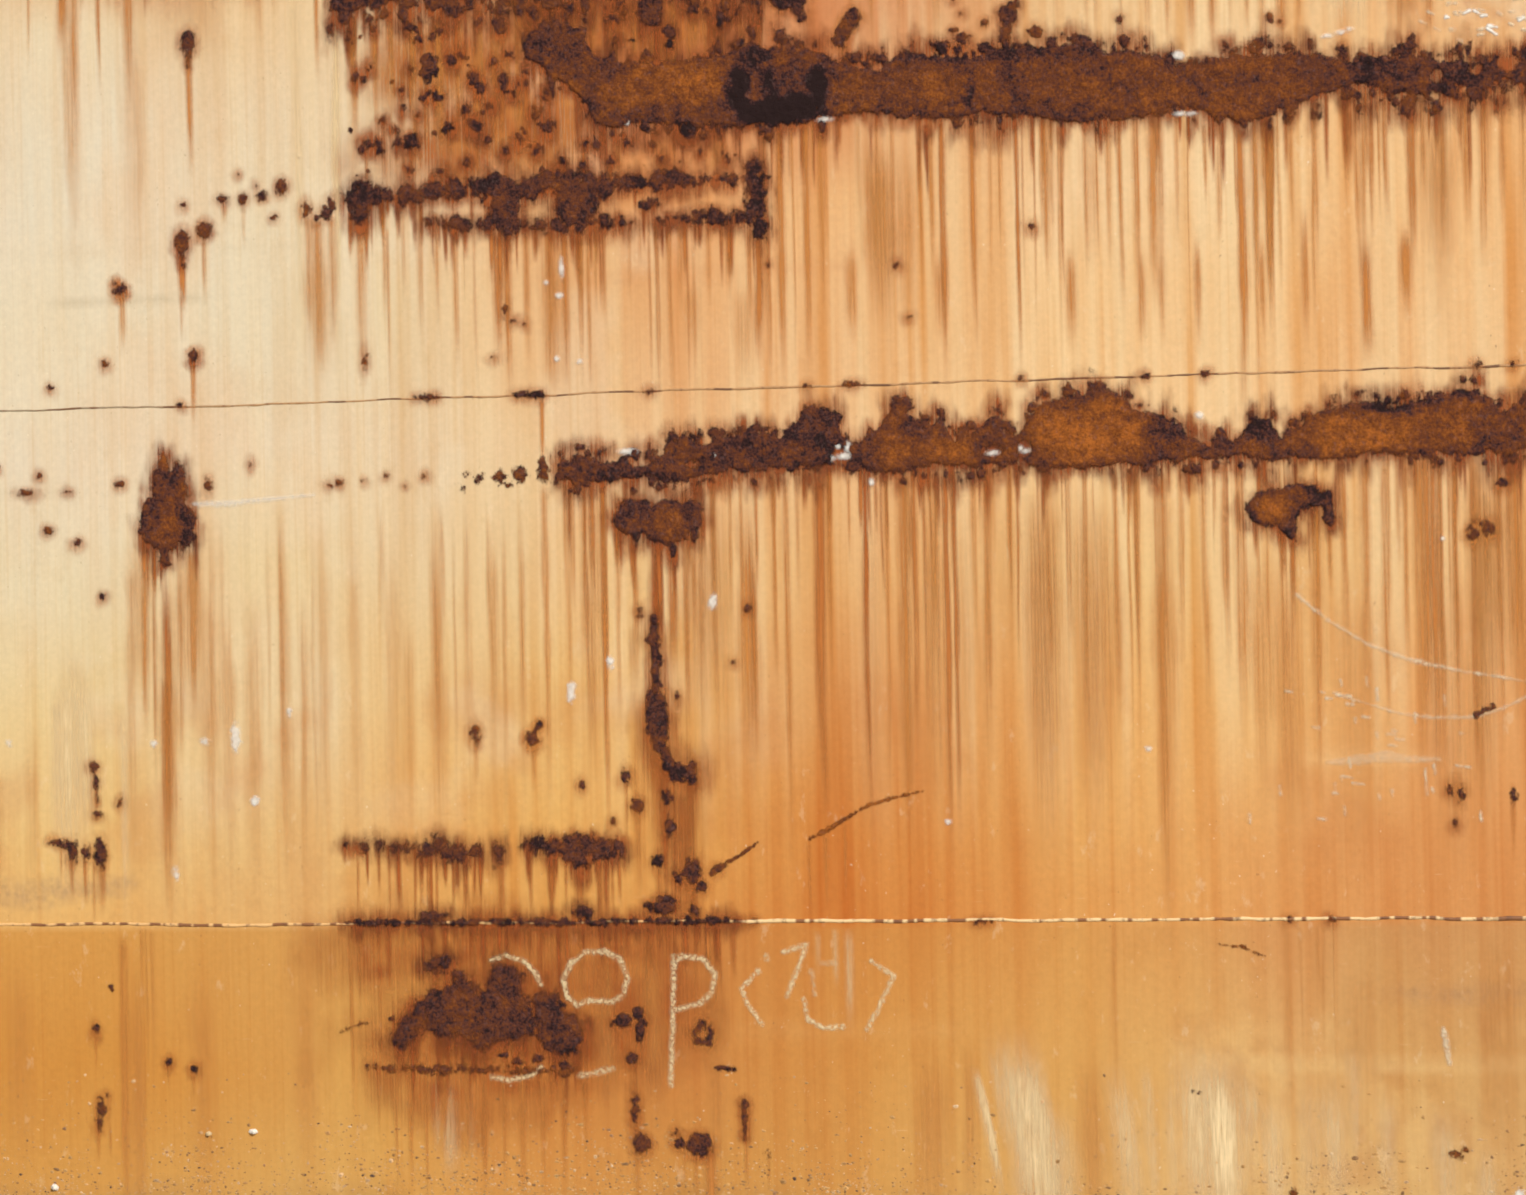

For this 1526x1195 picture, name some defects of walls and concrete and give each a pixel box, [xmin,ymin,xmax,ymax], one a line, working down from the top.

corrosion [59,0,76,70]
corrosion [216,173,288,220]
corrosion [301,0,1526,359]
corrosion [173,221,213,297]
corrosion [137,447,213,809]
corrosion [89,761,122,817]
corrosion [340,361,1526,1157]
corrosion [49,837,107,894]